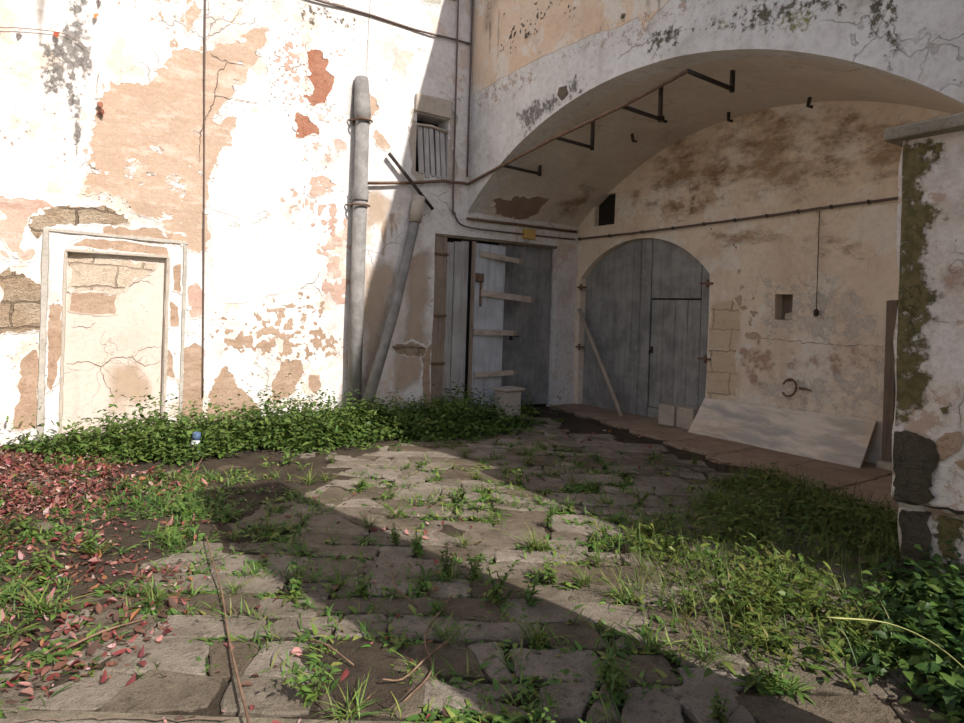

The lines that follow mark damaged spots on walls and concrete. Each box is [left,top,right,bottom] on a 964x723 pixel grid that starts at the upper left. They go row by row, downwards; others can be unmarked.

damp [585,0,844,55]
damp [869,0,899,68]
damp [40,0,92,155]
damp [658,110,806,187]
peeling [0,0,351,436]
peeling [492,193,550,220]
crack [69,346,160,392]
spalling [893,430,964,581]